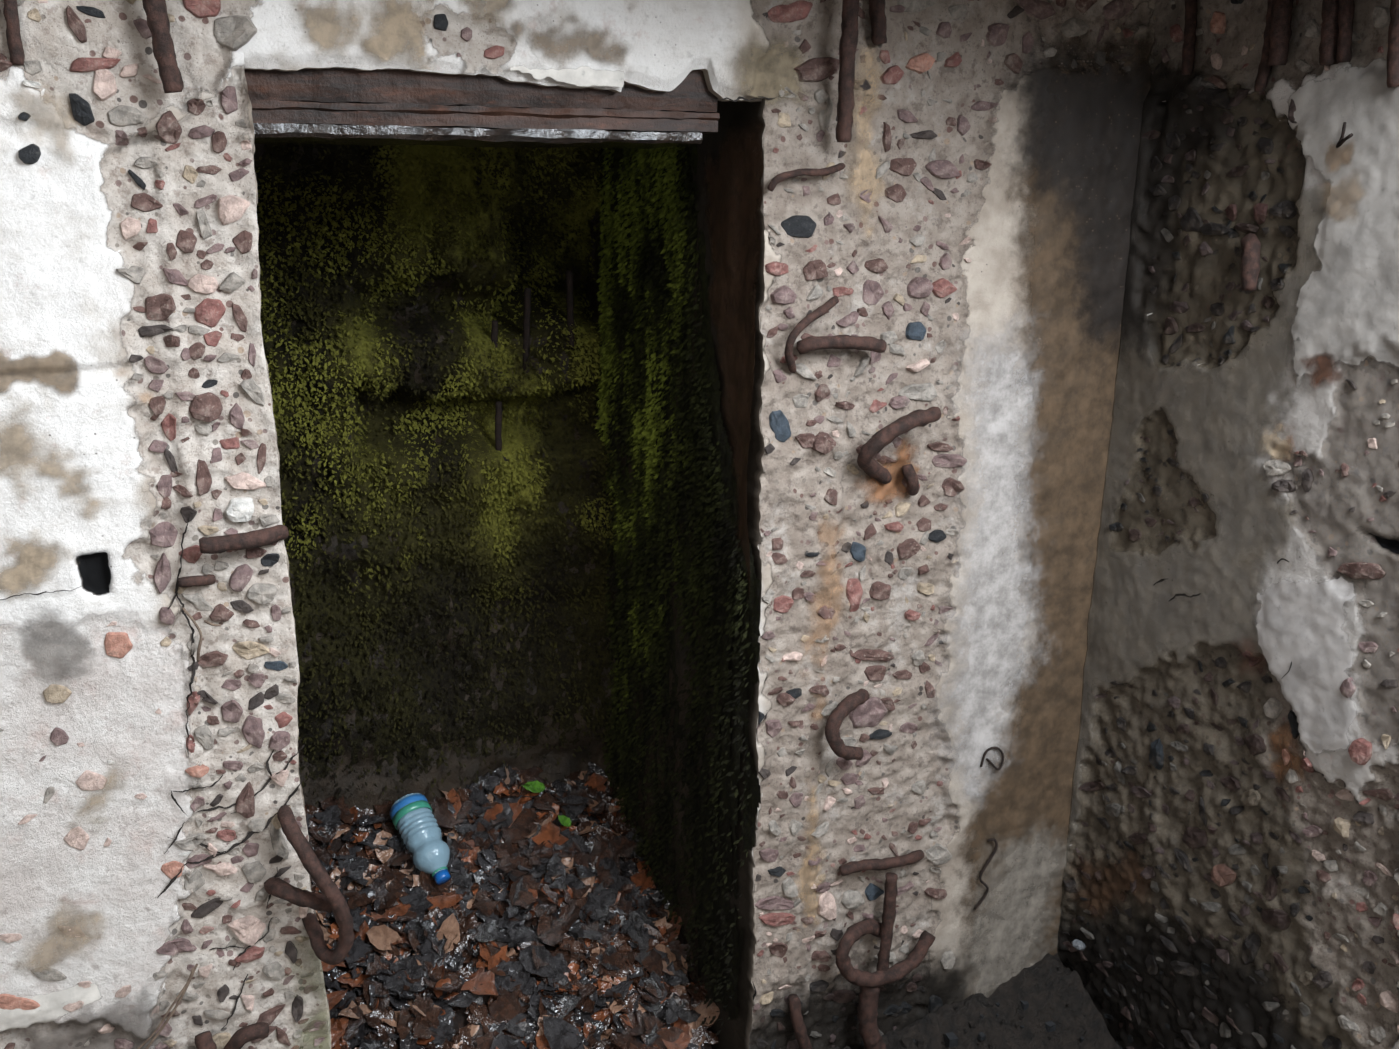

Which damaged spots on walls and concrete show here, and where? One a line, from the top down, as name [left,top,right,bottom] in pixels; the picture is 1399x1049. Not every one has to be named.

damp [299,0,434,70]
damp [465,0,627,63]
damp [738,42,802,104]
rust [853,52,882,208]
damp [0,350,79,393]
crack [0,585,84,600]
flaking render [0,0,355,1049]
crack [168,515,196,755]
rust [868,441,918,501]
spalling [749,0,1399,1049]
damp [877,34,1356,1049]
crack [158,745,305,897]